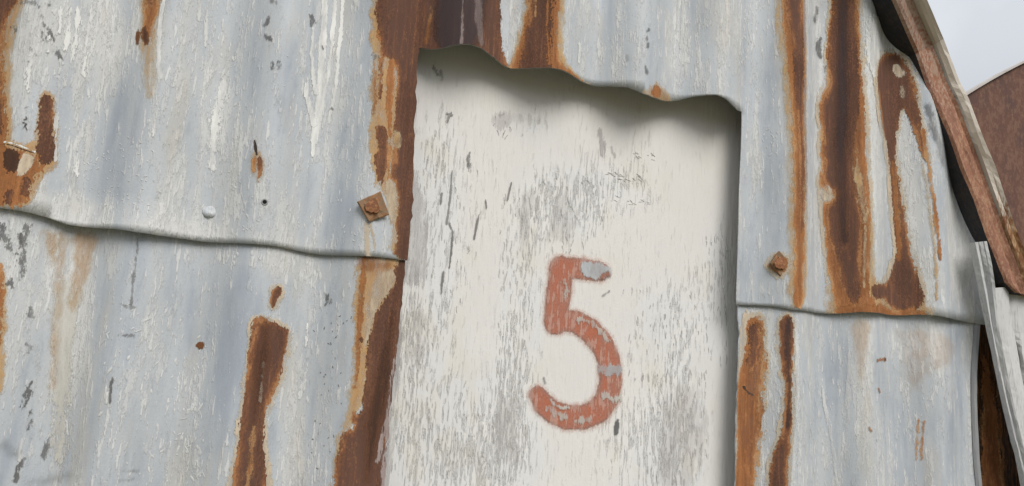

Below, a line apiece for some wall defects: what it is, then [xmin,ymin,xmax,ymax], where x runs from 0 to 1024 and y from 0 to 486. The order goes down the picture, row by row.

corrosion [0,0,59,209]
corrosion [135,0,162,91]
corrosion [251,140,263,181]
corrosion [226,283,293,486]
corrosion [330,0,588,486]
peeling [397,174,603,486]
peeling [628,235,731,486]
corrosion [736,0,942,486]